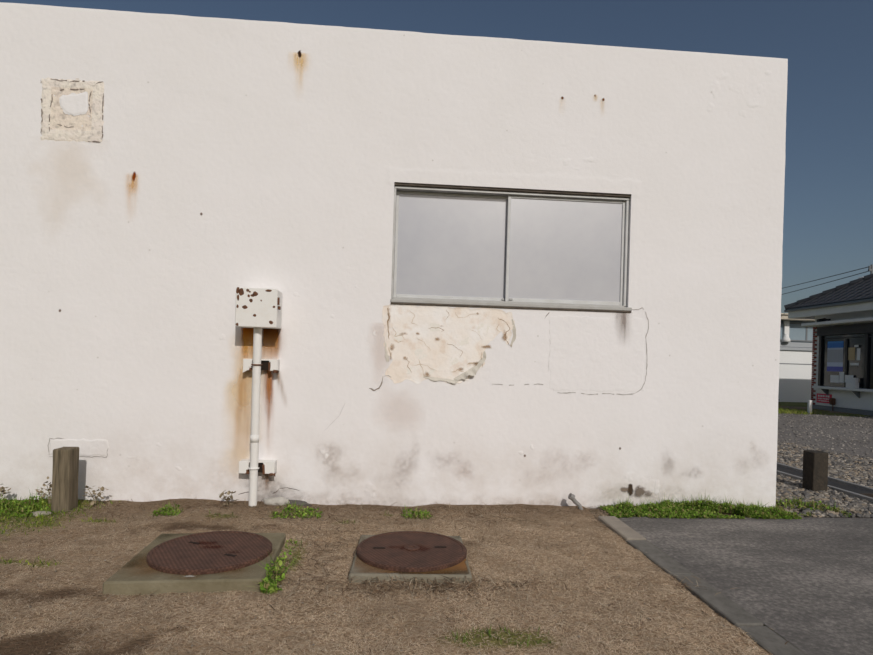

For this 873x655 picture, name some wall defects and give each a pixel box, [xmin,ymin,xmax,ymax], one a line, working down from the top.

corrosion [243,328,279,350]
peeling [382,304,516,384]
corrosion [266,370,279,410]